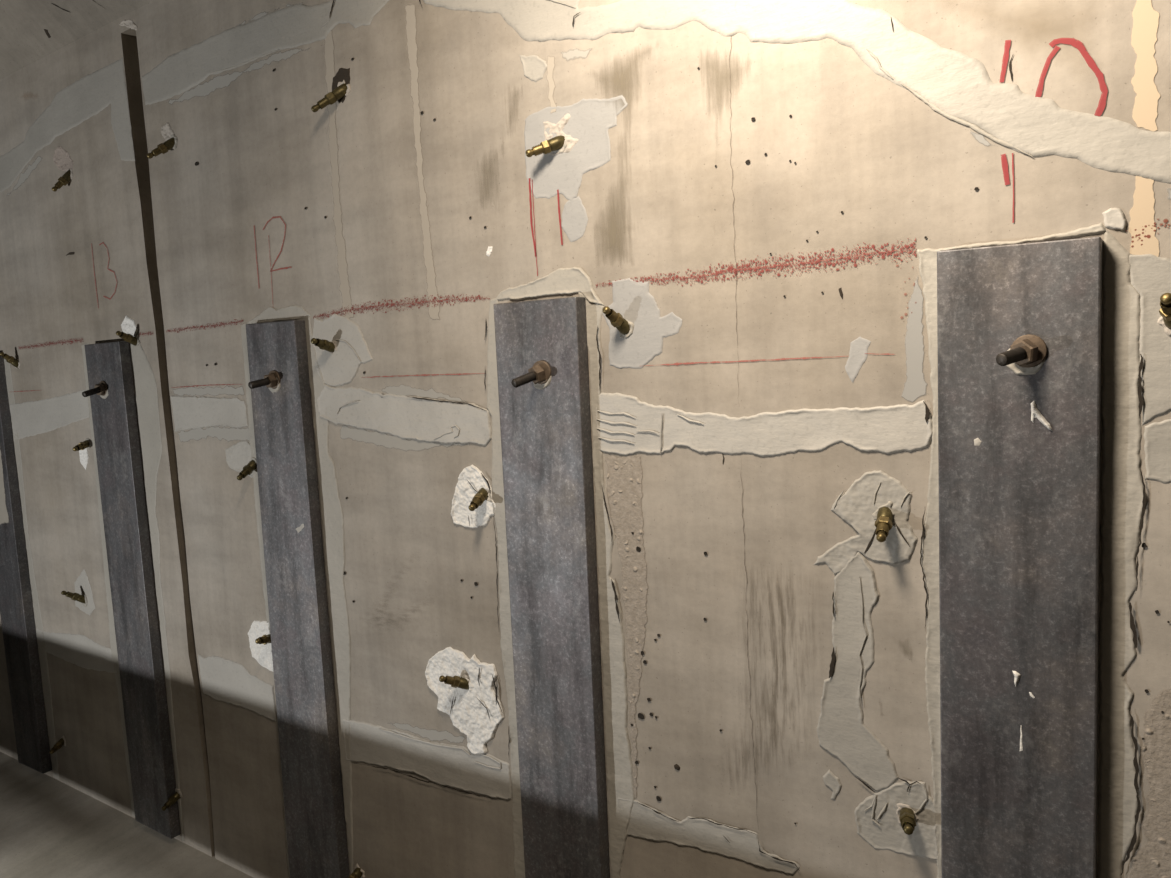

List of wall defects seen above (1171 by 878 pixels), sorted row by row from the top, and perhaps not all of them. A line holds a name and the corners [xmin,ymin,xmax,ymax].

spalling [332,68,350,103]
spalling [543,113,578,156]
crack [1137,354,1145,418]
spalling [605,455,648,798]
crack [1129,469,1146,648]
crack [1121,710,1141,875]
spalling [1130,689,1171,878]